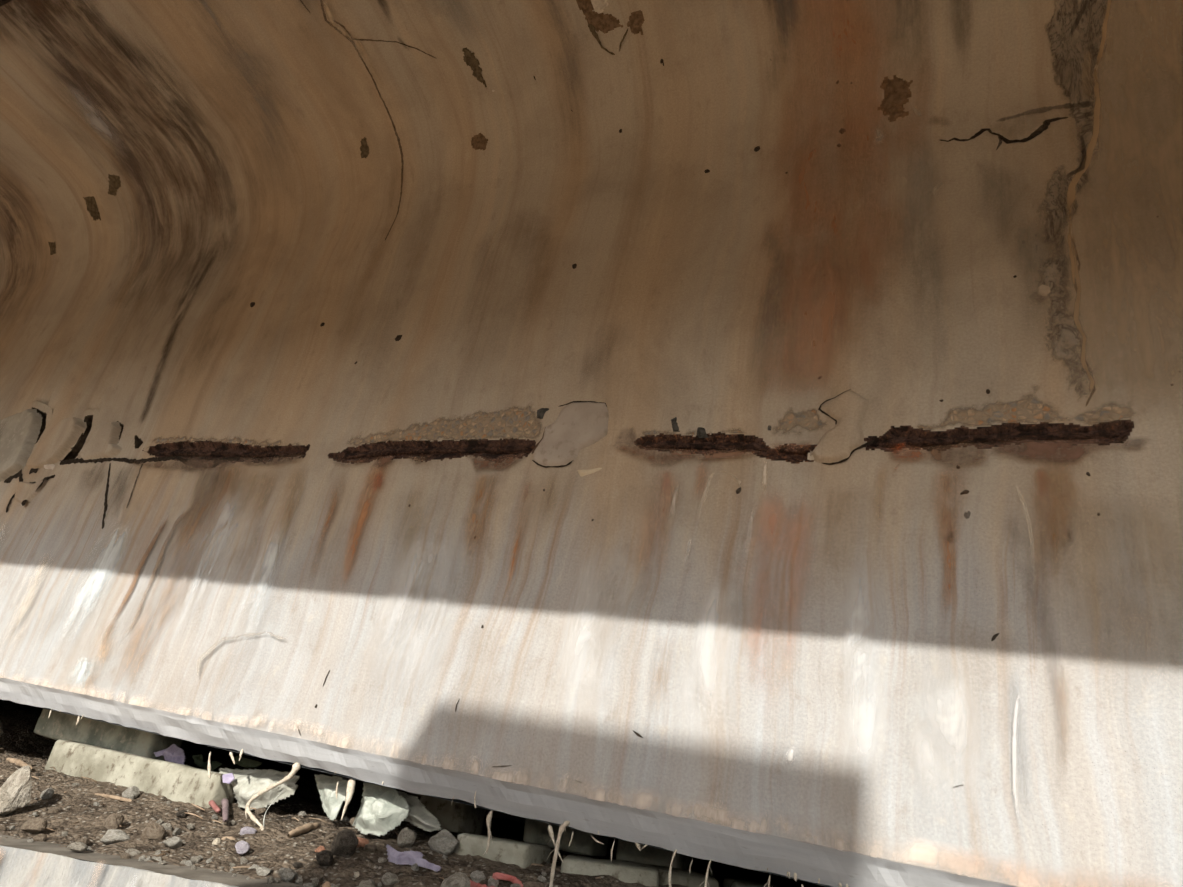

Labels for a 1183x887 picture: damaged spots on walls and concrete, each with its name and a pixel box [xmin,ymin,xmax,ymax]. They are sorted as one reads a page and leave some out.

crack [300,0,437,240]
crack [940,117,1068,150]
spalling [133,406,549,475]
spalling [620,409,827,473]
spalling [851,389,1152,469]
corrosion [116,470,234,628]